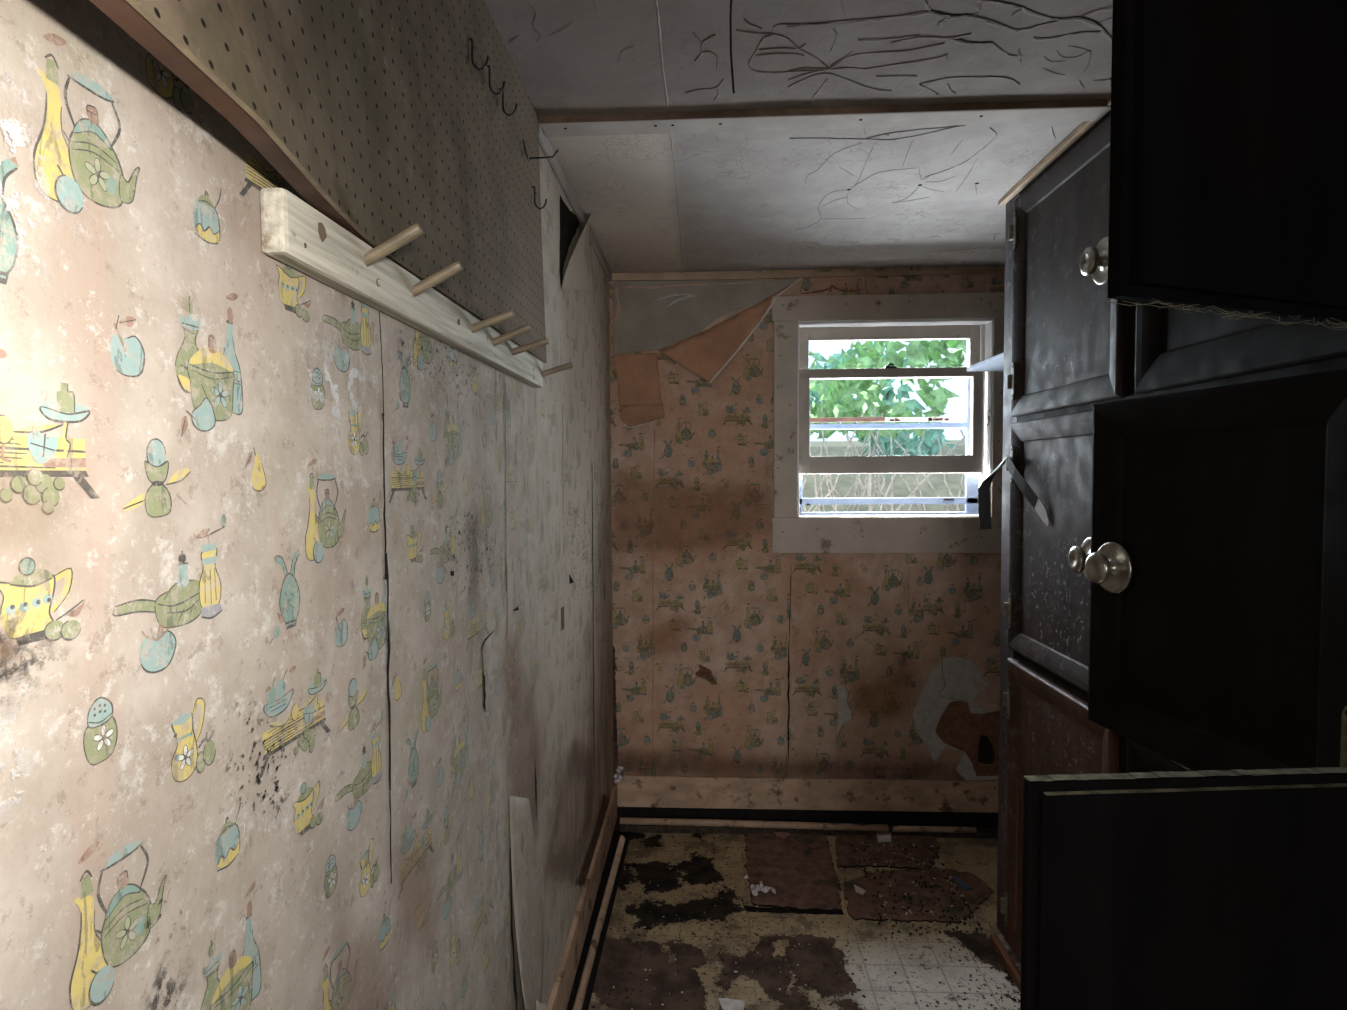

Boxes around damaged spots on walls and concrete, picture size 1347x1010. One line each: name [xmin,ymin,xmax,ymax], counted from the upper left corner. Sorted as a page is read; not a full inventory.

crack [685,0,1113,230]
peeling [613,278,802,428]
leakage [0,636,36,679]
leakage [229,713,289,816]
peeling [913,656,1000,781]
peeling [509,796,547,1010]
peeling [630,832,725,895]
peeling [753,934,858,1010]